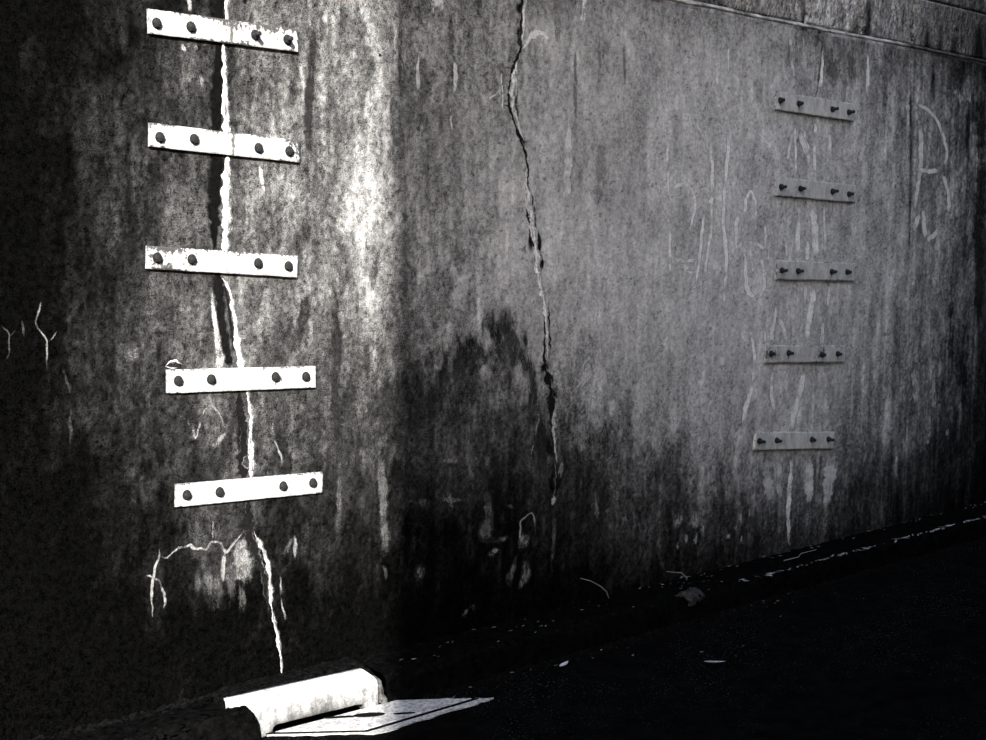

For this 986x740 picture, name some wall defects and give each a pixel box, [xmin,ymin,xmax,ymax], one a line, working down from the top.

crack [148,0,285,673]
water stain [298,298,310,334]
water stain [329,293,579,522]
crack [486,0,561,564]
crack [290,537,298,557]